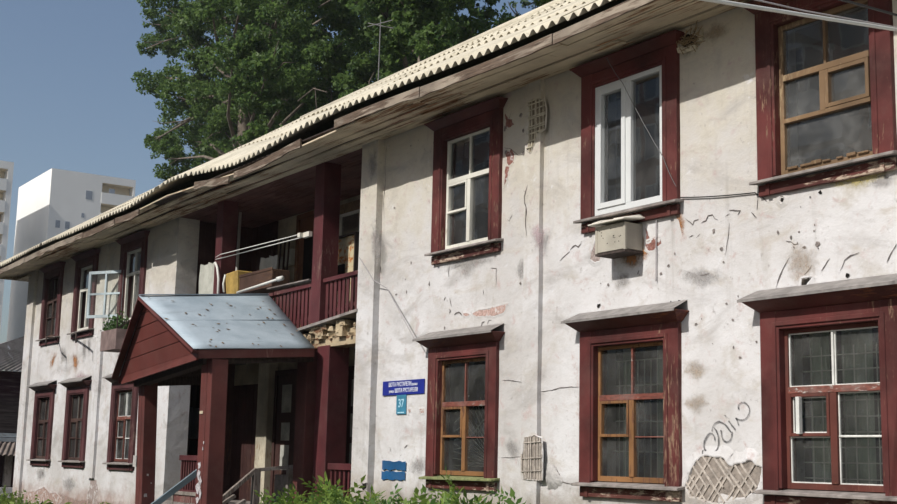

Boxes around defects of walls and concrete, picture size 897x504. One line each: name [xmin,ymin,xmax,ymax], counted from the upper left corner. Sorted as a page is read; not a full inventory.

peeling [503,147,525,188]
crack [685,197,766,255]
peeling [462,302,509,319]
spalling [680,445,764,504]